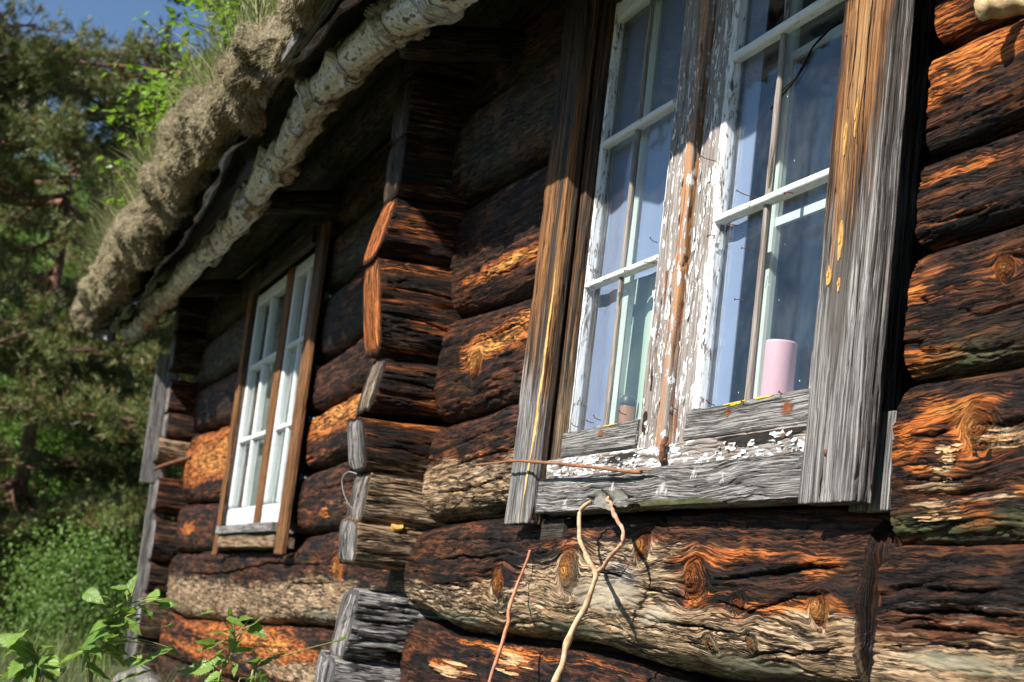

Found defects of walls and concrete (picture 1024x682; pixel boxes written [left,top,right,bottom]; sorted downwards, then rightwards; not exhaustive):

peeling [671,108,692,163]
peeling [689,168,711,280]
peeling [651,258,675,354]
peeling [643,397,660,447]
peeling [715,429,805,460]
crack [584,559,846,662]